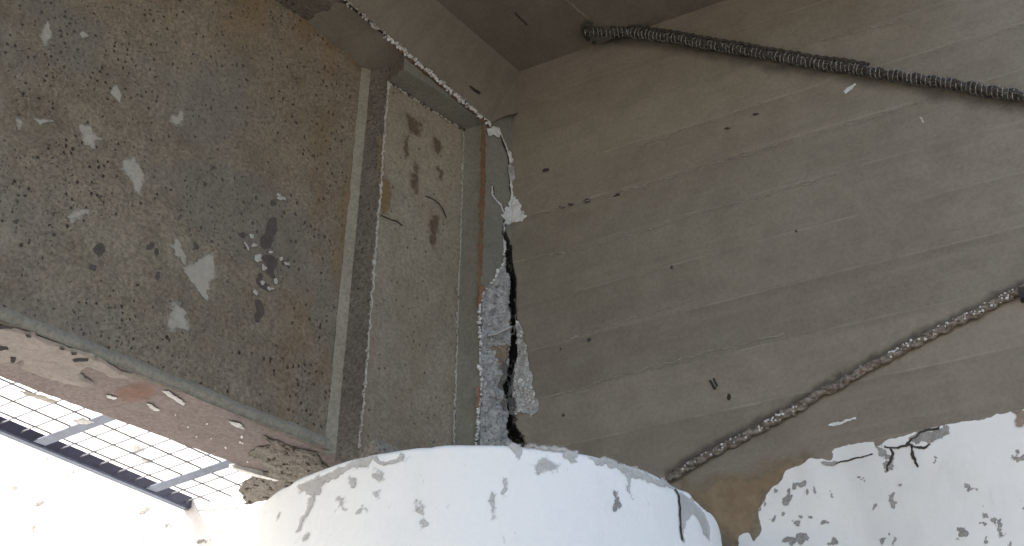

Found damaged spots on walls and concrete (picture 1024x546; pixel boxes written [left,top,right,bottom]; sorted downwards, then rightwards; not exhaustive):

crack [491,125,525,447]
spalling [343,0,710,542]
peeling [0,325,132,387]
peeling [20,391,58,403]
peeling [1015,410,1024,427]
crack [835,453,873,465]
peeling [876,425,949,473]
crack [675,489,683,541]
peeling [757,480,828,546]
peeling [979,514,1012,546]